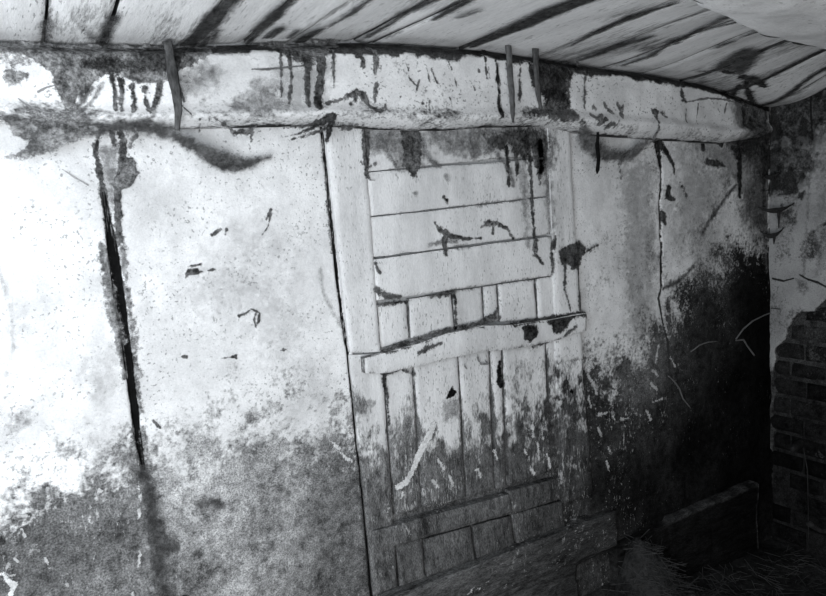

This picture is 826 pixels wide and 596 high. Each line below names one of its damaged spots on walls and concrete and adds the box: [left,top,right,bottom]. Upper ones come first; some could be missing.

damp [179,65,216,115]
damp [232,90,280,113]
crack [700,141,742,234]
damp [697,49,826,272]
crack [655,141,694,403]
crack [62,142,173,596]
flaking render [770,307,826,548]
damp [160,537,179,552]
damp [198,499,225,511]